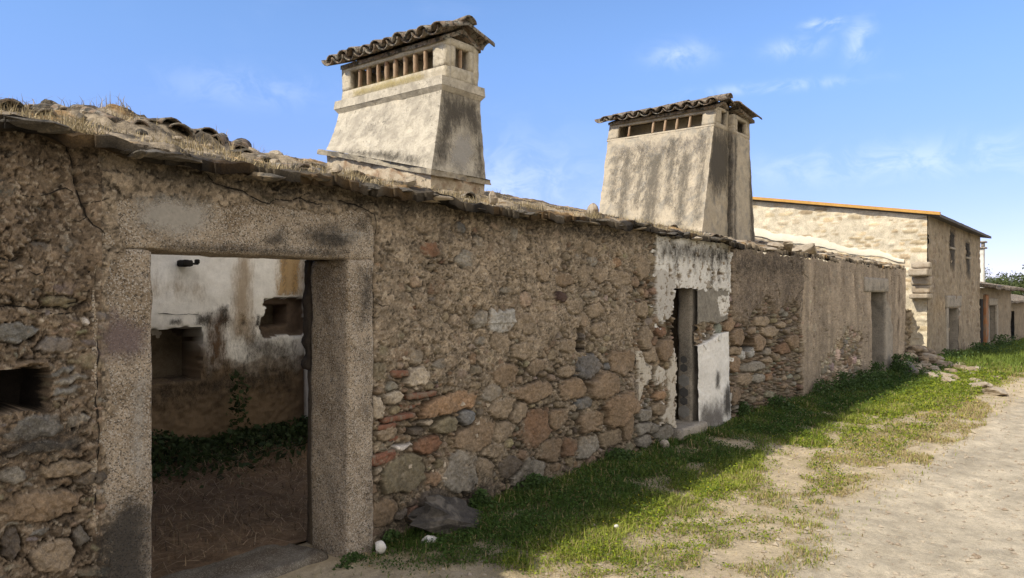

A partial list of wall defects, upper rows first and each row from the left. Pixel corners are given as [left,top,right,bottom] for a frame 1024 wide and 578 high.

crack [23,147,108,234]
crack [199,172,376,248]
water stain [151,306,293,410]
flaking render [634,343,677,428]
spalling [649,235,804,427]